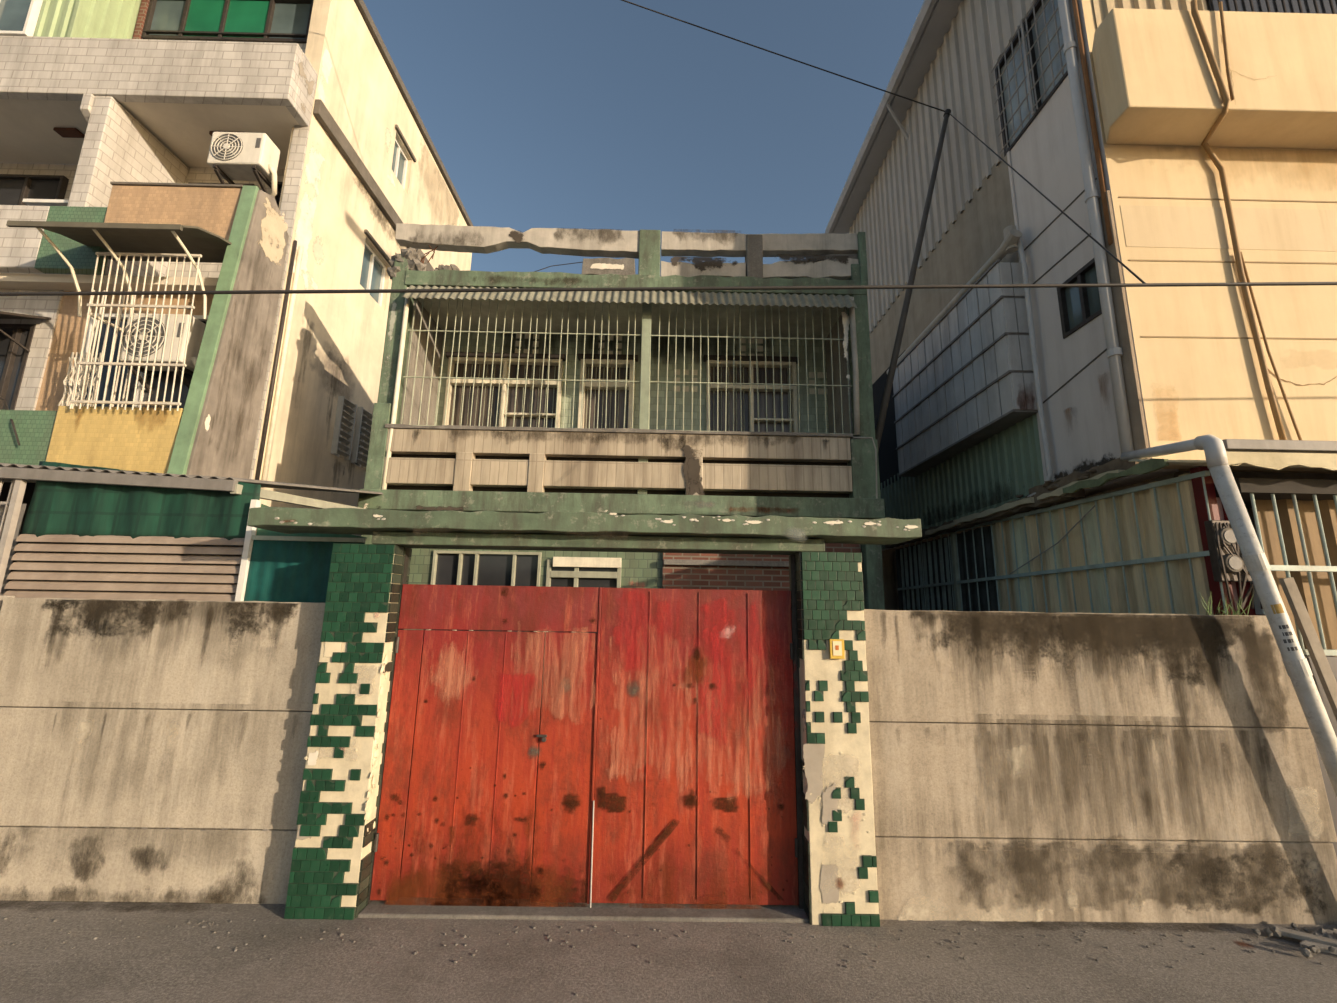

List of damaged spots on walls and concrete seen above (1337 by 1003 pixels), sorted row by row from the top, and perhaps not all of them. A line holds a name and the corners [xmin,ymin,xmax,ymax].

spalling [682,445,705,495]
spalling [655,516,770,526]
spalling [812,520,918,531]
leakage [43,599,188,636]
leakage [206,602,299,632]
leakage [934,611,1289,736]
corrosion [598,787,630,813]
corrosion [685,789,738,812]
spalling [802,709,870,845]
corrosion [427,845,587,907]
corrosion [609,820,679,901]
leakage [1090,839,1300,915]